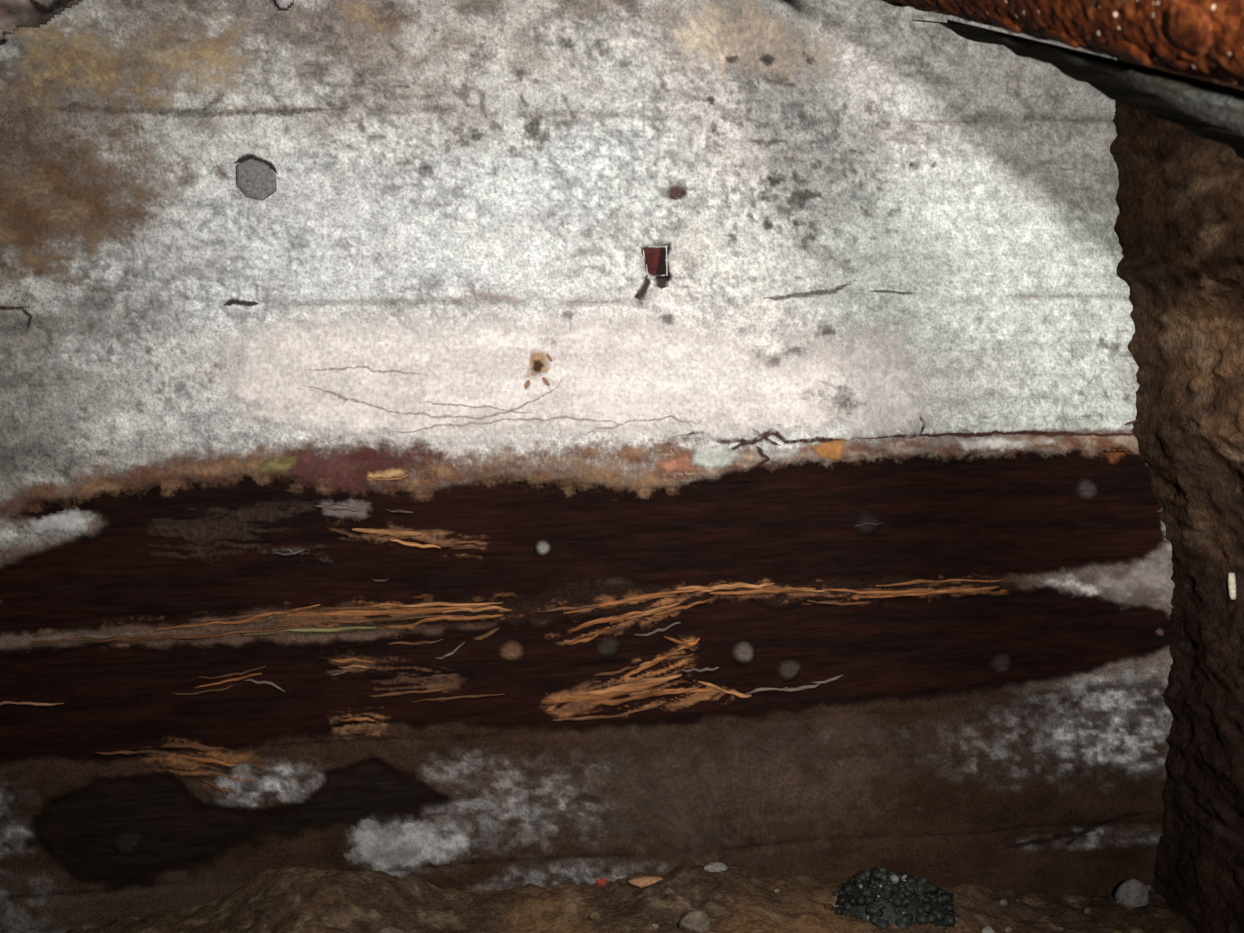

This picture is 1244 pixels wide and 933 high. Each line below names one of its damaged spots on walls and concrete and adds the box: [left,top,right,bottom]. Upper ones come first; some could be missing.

leakage [0,22,248,109]
corrosion [1106,39,1154,67]
leakage [0,124,150,287]
crack [678,415,1139,469]
leakage [569,722,920,868]